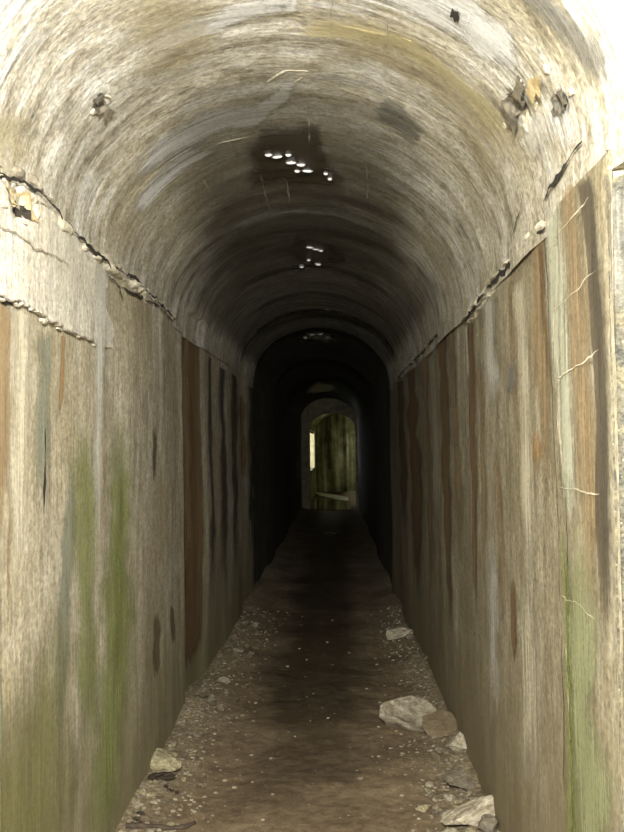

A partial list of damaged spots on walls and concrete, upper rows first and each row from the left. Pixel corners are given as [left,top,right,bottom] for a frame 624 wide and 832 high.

spalling [90,92,115,121]
spalling [500,65,575,154]
rust [0,302,16,595]
peeling [0,177,115,350]
damp [57,485,75,734]
crack [0,165,180,325]
rust [181,337,204,663]
rust [438,323,486,608]
crack [396,141,582,605]
rust [495,465,516,655]
rust [531,242,549,467]
damp [605,177,624,340]